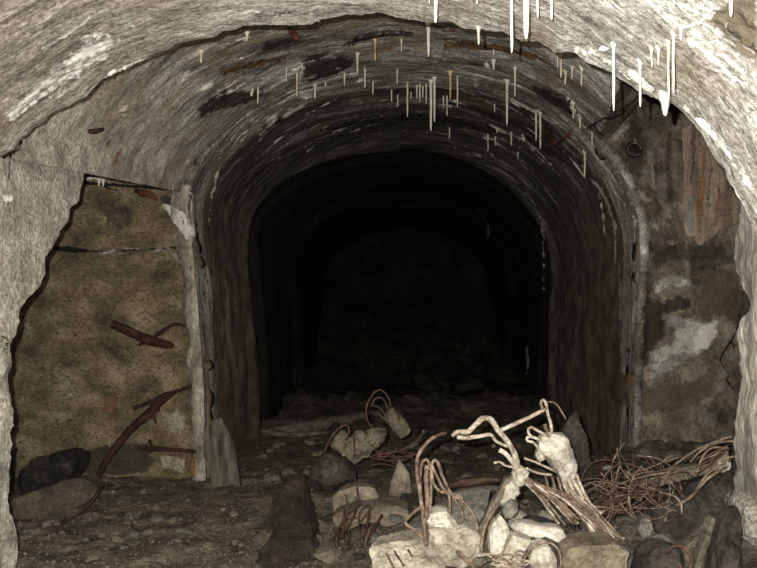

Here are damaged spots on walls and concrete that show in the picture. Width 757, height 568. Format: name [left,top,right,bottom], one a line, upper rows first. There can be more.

damp [229,8,319,25]
damp [342,32,409,46]
damp [573,46,659,98]
spalling [610,125,629,141]
spalling [161,157,198,245]
damp [197,52,632,363]
peeling [639,124,740,246]
crack [53,246,177,254]
peeling [654,276,690,294]
damp [642,273,691,365]